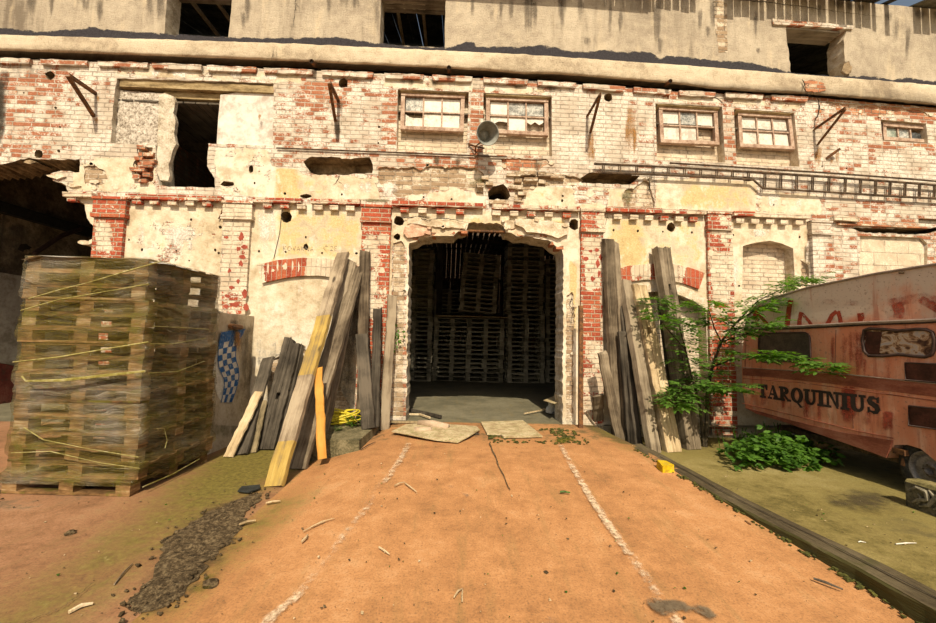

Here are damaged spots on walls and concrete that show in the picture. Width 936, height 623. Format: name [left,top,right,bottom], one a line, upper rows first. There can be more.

flaking render [304,157,655,208]
peeling [223,232,249,311]